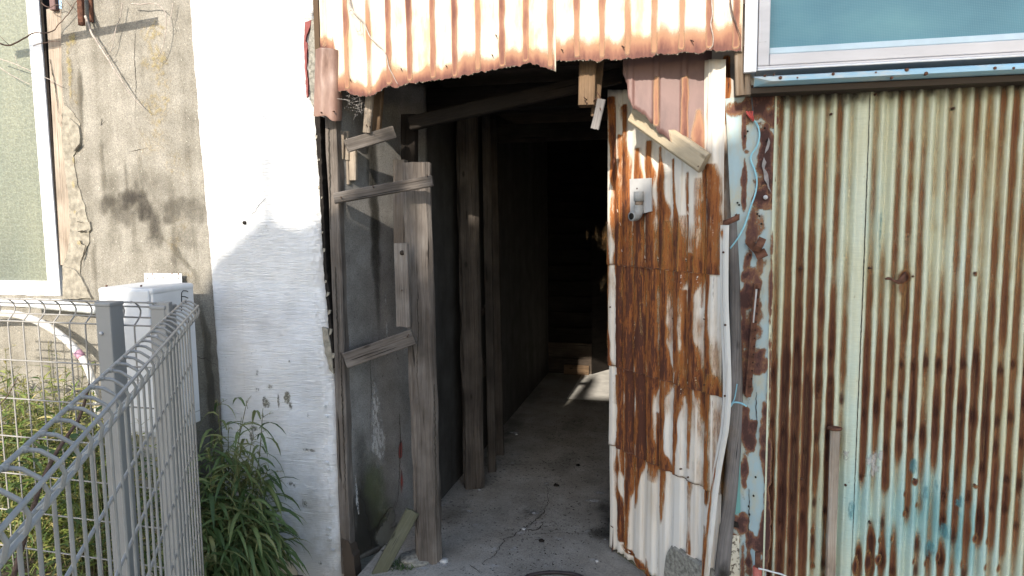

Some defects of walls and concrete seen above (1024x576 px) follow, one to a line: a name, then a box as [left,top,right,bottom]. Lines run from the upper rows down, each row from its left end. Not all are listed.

crack [470,480,576,573]
rust [320,0,848,576]
rust [852,511,896,576]
rust [859,87,1024,576]